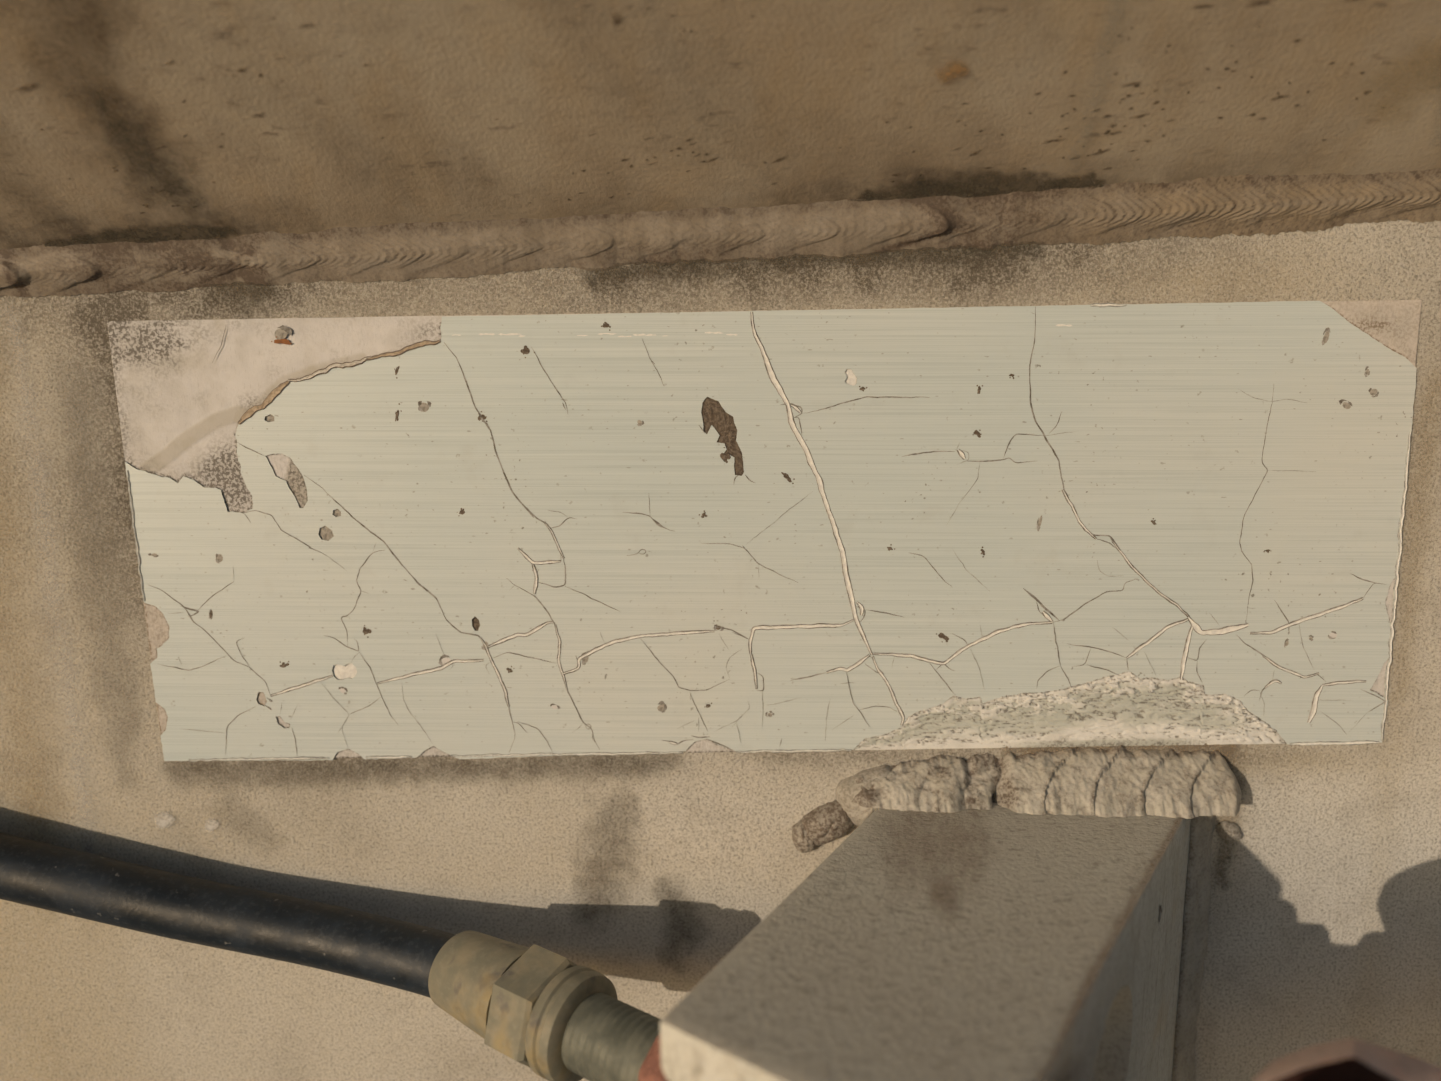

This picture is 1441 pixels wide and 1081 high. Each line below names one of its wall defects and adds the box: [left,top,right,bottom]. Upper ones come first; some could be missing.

peeling [107,316,445,513]
crack [149,307,1385,754]
peeling [853,671,1286,750]